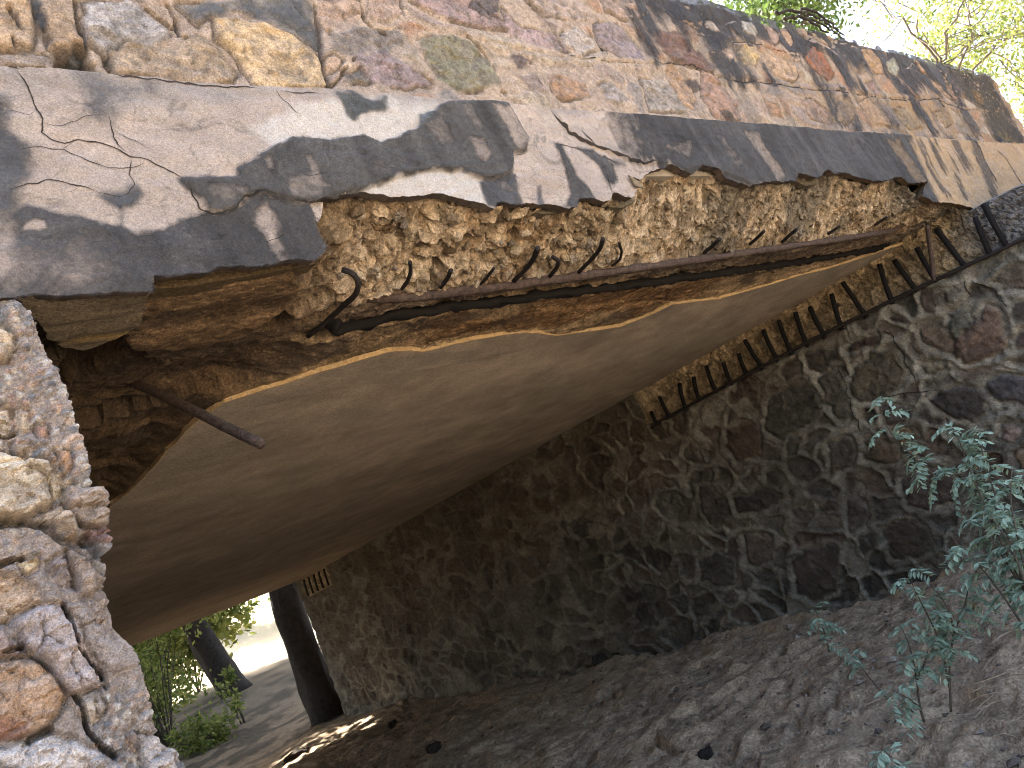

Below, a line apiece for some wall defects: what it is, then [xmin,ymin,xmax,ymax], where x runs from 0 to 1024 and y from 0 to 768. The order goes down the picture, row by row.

crack [8,66,320,215]
crack [552,112,657,191]
spalling [17,168,1024,501]
rust [428,278,720,341]